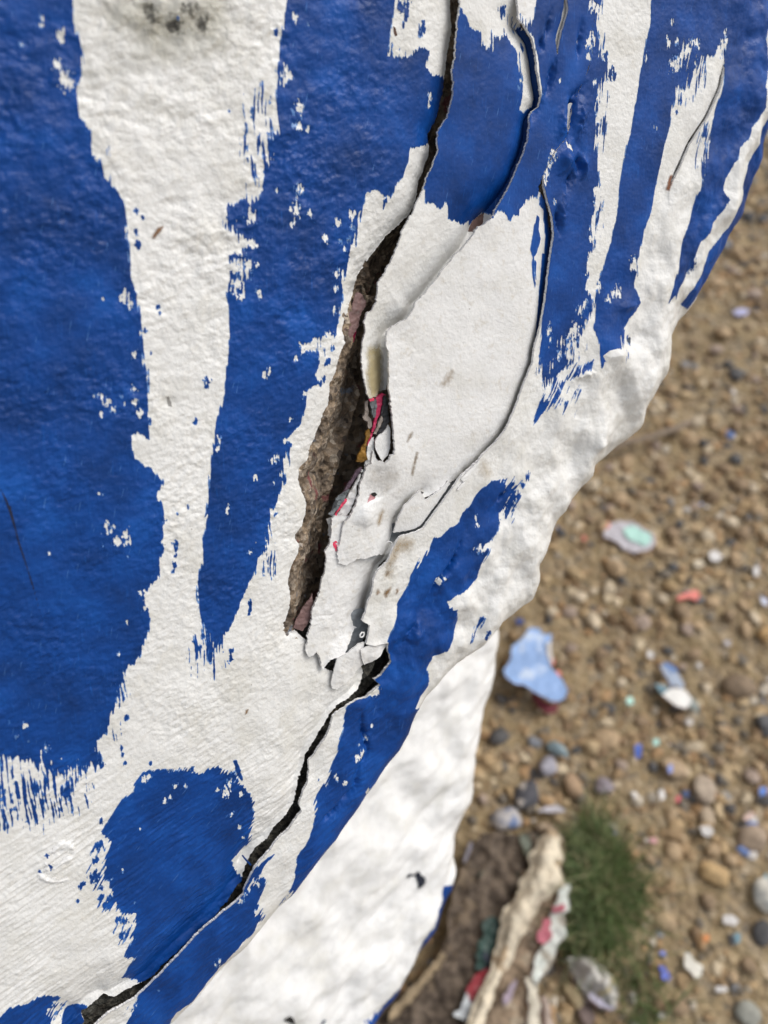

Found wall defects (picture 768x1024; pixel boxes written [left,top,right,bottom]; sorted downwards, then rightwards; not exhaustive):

crack [361,99,441,313]
crack [468,213,484,232]
crack [672,105,710,178]
peeling [283,0,596,689]
crack [389,480,455,541]
crack [81,608,384,1024]